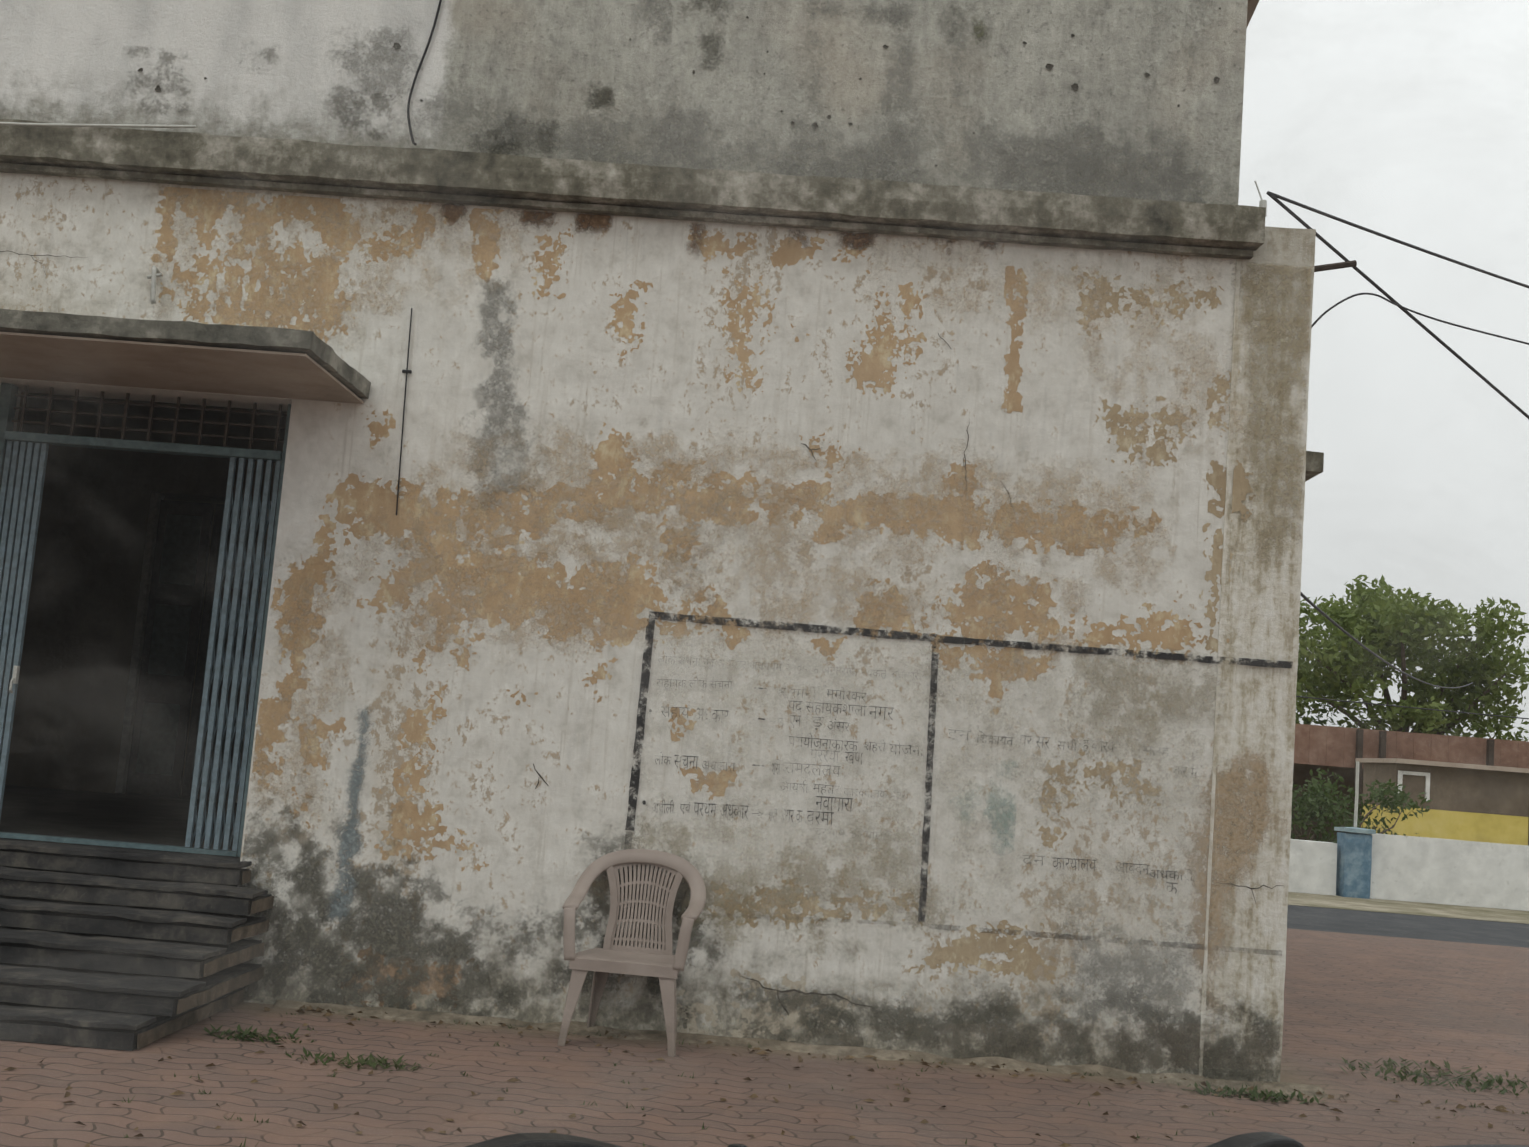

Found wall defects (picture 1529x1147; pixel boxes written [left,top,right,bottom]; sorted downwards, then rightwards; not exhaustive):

damp [340,37,402,120]
damp [476,87,722,169]
peeling [151,187,505,343]
peeling [528,228,573,300]
peeling [605,280,653,361]
peeling [688,230,929,399]
peeling [1001,266,1029,413]
peeling [1065,253,1224,345]
peeling [1095,369,1241,473]
peeling [252,422,1256,871]
damp [241,711,758,1017]
damp [744,754,1280,1081]